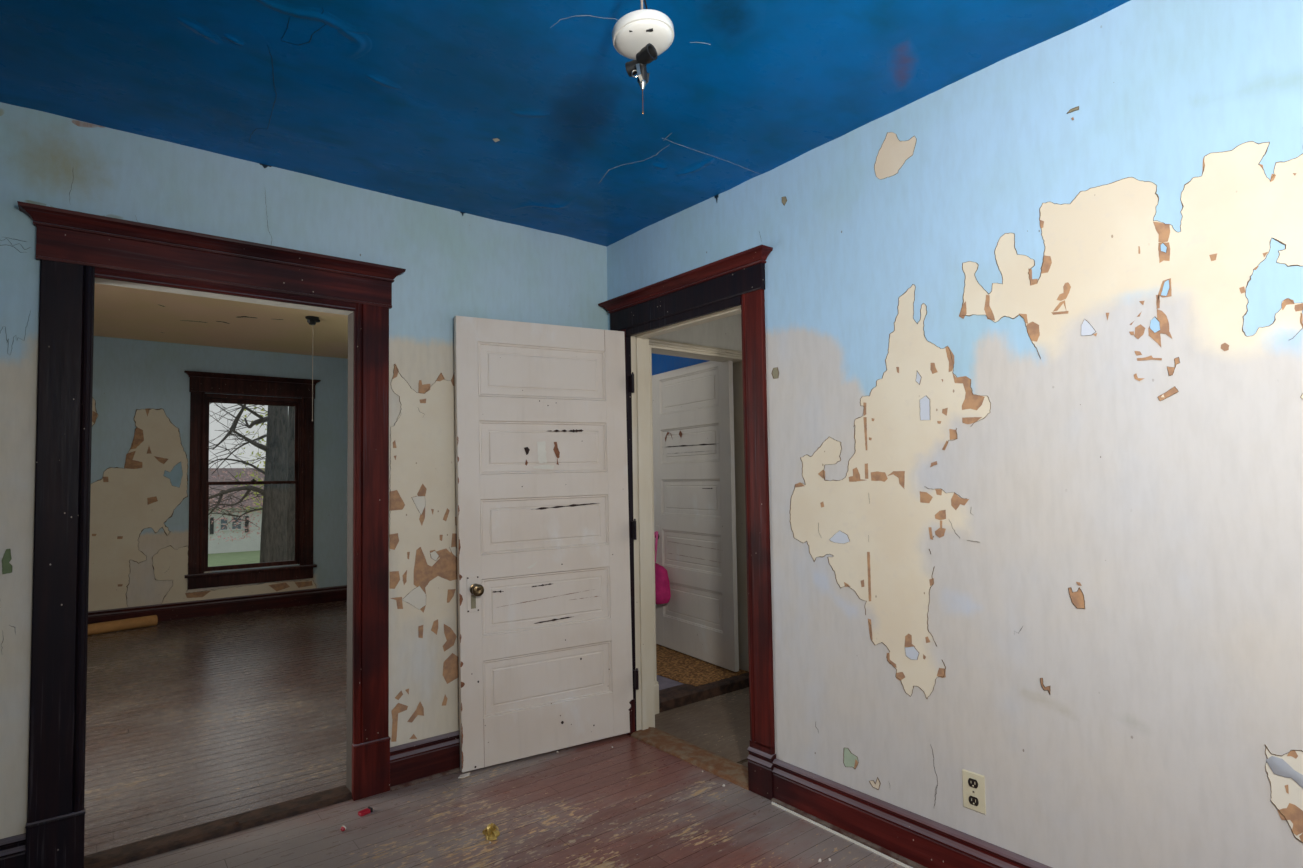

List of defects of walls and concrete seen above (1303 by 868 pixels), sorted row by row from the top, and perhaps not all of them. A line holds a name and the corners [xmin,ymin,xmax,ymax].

peeling [874,132,917,180]
peeling [959,141,1303,401]
peeling [88,408,316,611]
peeling [389,364,479,768]
peeling [790,284,991,699]
peeling [1264,744,1303,843]